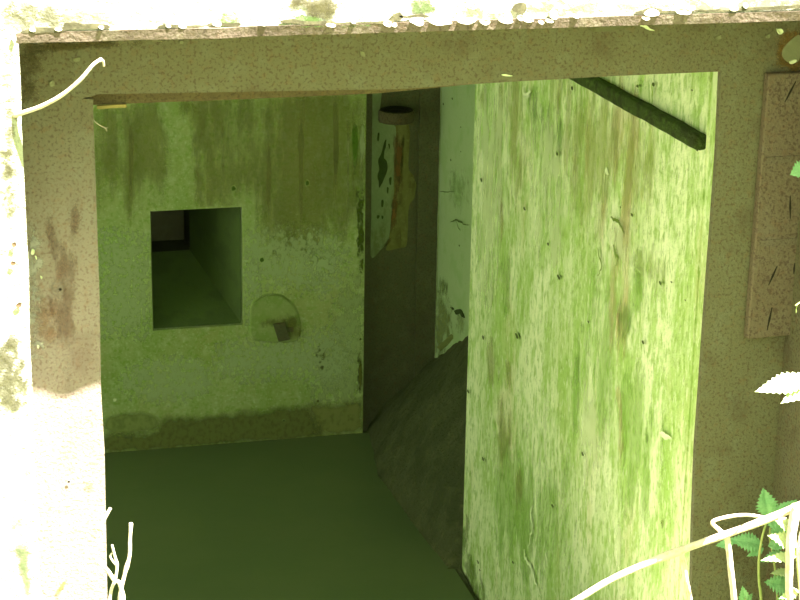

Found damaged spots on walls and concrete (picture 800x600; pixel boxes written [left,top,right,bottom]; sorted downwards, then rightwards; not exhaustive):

peeling [371,93,416,258]
rust [391,137,404,230]
damp [98,95,365,453]